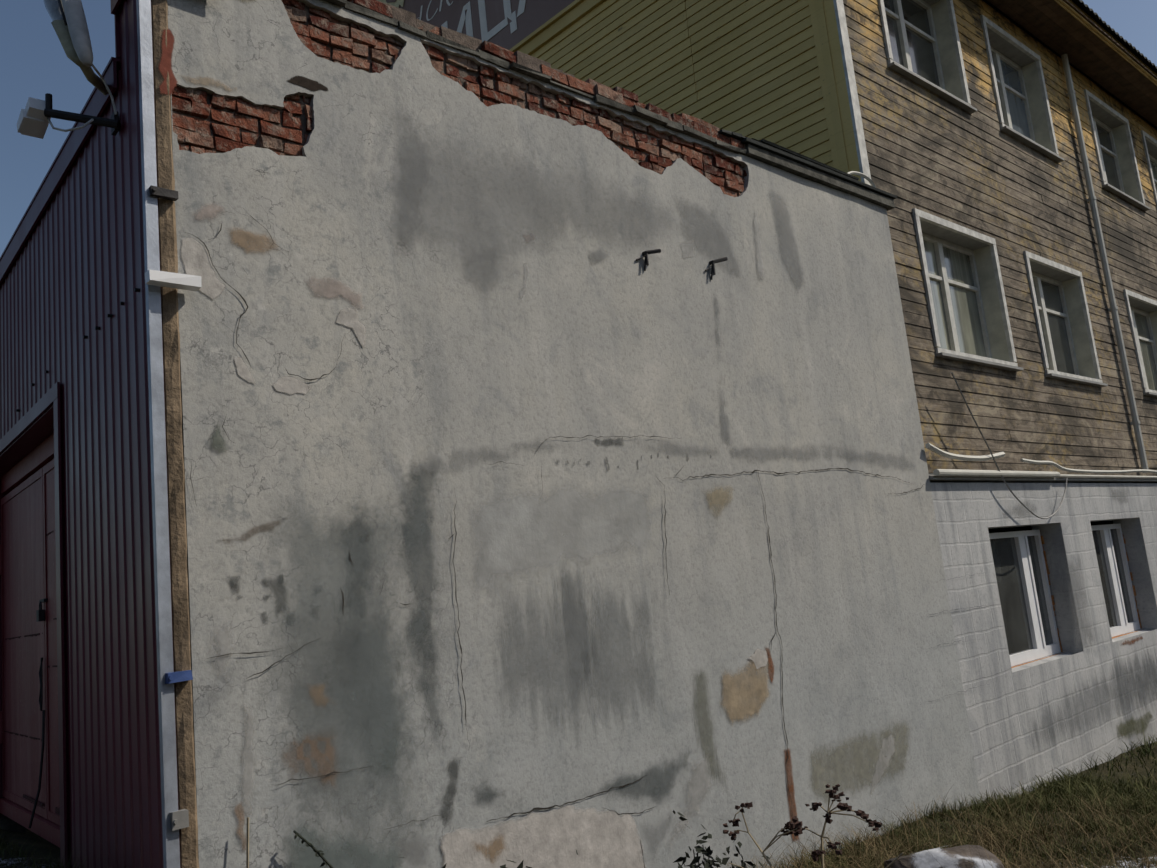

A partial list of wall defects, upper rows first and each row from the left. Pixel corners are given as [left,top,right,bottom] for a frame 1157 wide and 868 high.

flaking render [159,29,328,156]
flaking render [281,0,404,73]
flaking render [422,43,747,197]
crack [185,208,282,366]
damp [263,522,400,817]
damp [404,473,435,695]
crack [485,435,925,836]
rust [766,648,774,682]
damp [290,828,398,868]
peeling [441,805,645,868]
crack [487,775,656,867]
rust [785,749,799,840]